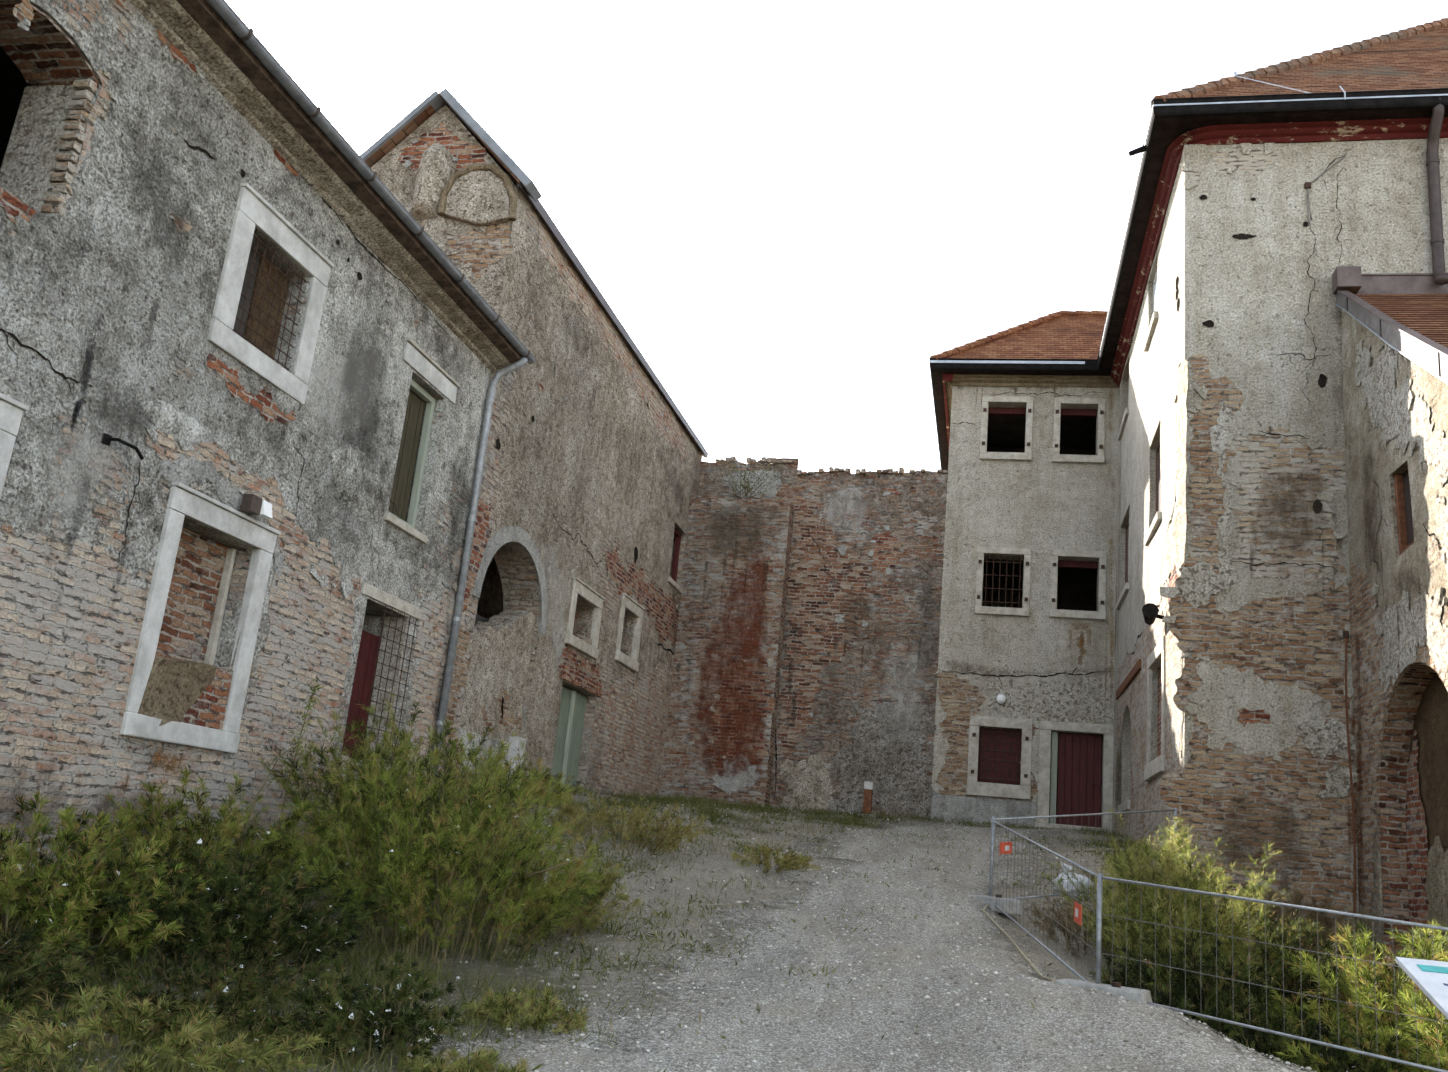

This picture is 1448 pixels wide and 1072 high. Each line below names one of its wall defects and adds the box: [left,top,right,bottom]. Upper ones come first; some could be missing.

spalling [13,0,34,31]
flaking render [64,70,117,201]
flaking render [0,187,36,234]
crack [1237,148,1352,439]
crack [0,328,92,397]
spalling [205,353,296,426]
peeling [1407,390,1415,411]
flaking render [0,420,362,881]
damp [696,507,768,777]
flaking render [1113,354,1385,931]
flaking render [930,669,1040,805]
flaking render [1406,730,1437,961]